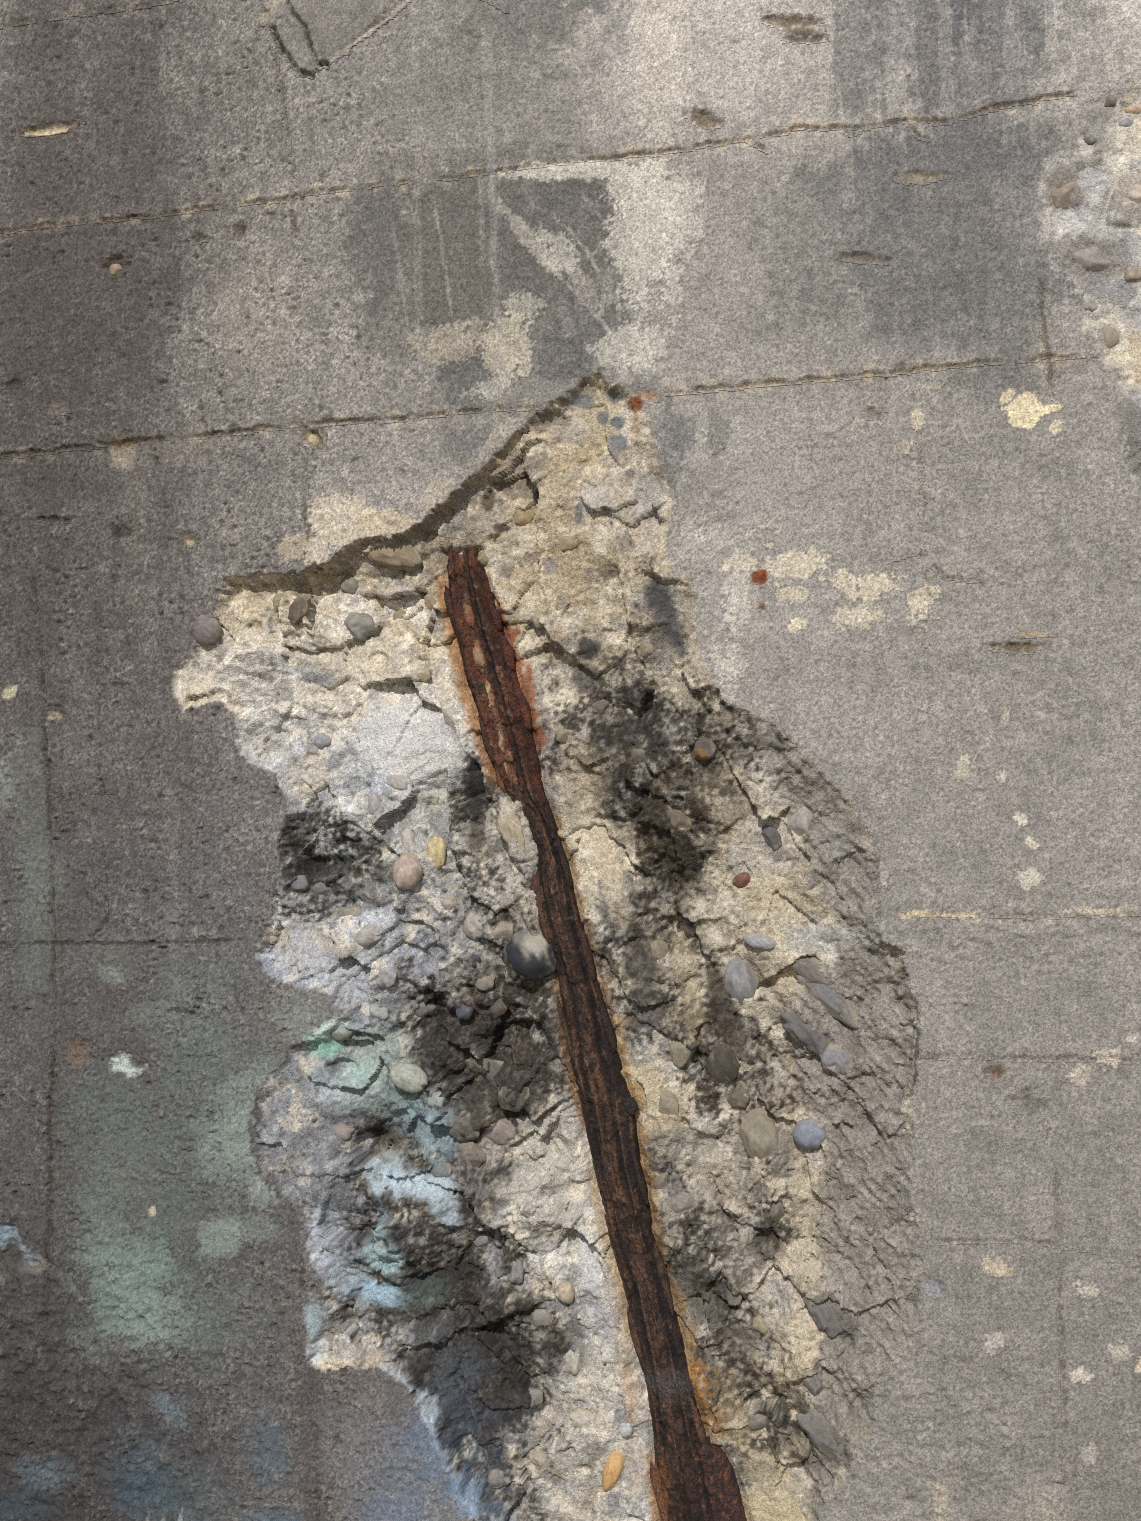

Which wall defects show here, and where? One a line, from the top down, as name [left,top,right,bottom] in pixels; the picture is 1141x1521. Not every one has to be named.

spalling [1038,65,1141,497]
spalling [173,0,976,1521]
rust [431,548,747,1521]
peeling [950,749,1007,783]
peeling [1012,811,1045,892]
peeling [1046,906,1124,917]